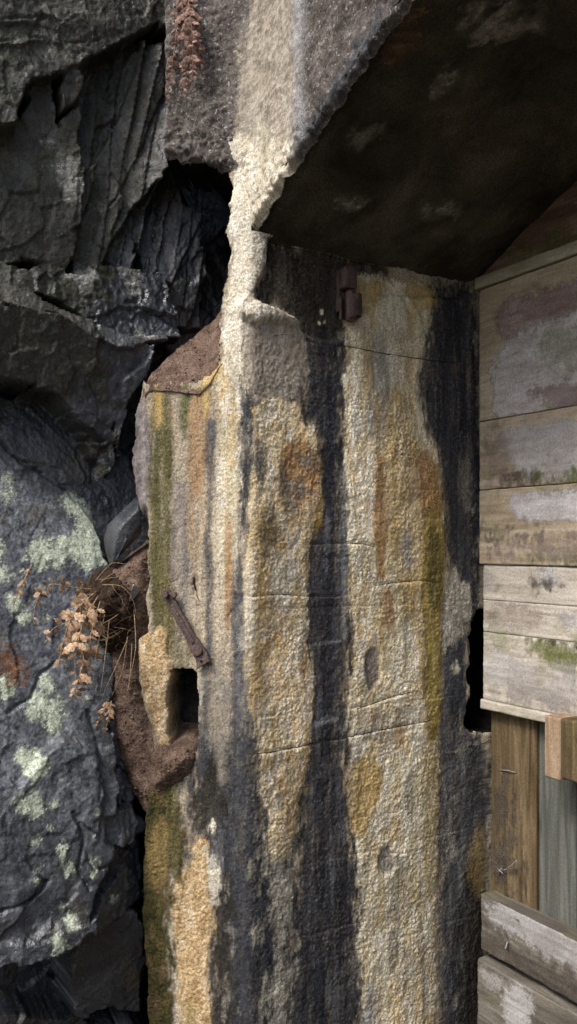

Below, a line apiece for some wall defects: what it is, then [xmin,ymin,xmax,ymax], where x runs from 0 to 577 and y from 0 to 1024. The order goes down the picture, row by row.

damp [132,390,162,530]
damp [165,0,577,1024]
damp [139,626,178,745]
crack [244,690,435,754]